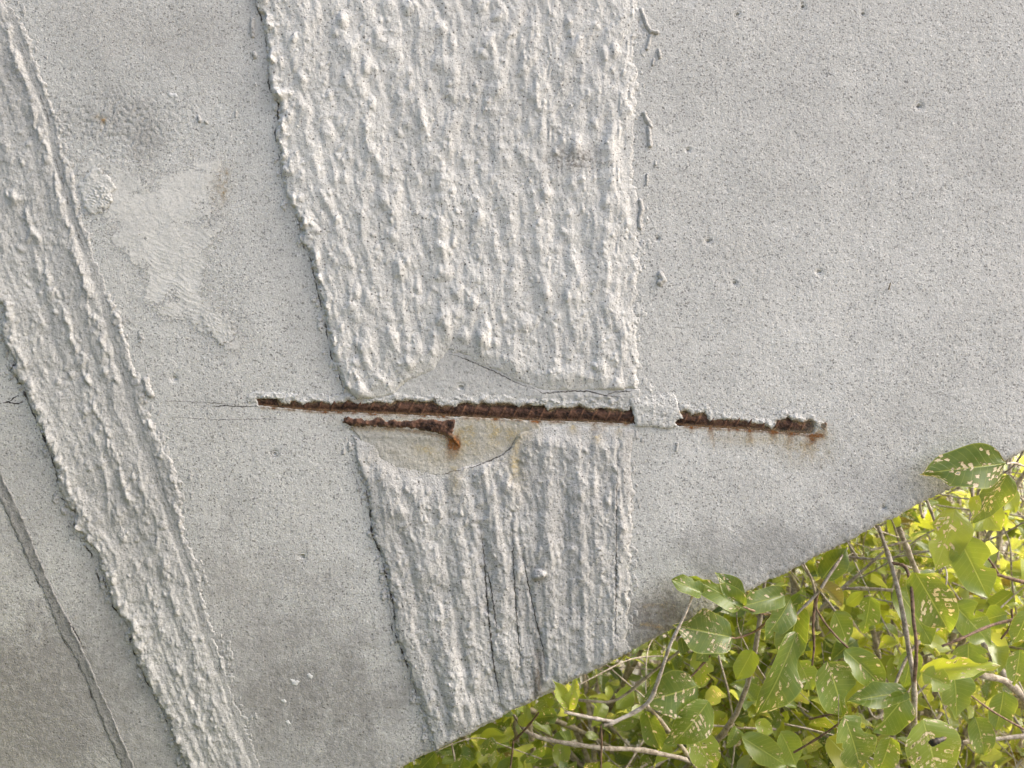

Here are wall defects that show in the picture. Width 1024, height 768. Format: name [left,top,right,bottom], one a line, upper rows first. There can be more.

crack [450,354,634,399]
crack [442,438,516,475]
rust [441,417,575,478]
spalling [246,349,824,475]
rust [684,421,827,448]
crack [481,529,545,709]